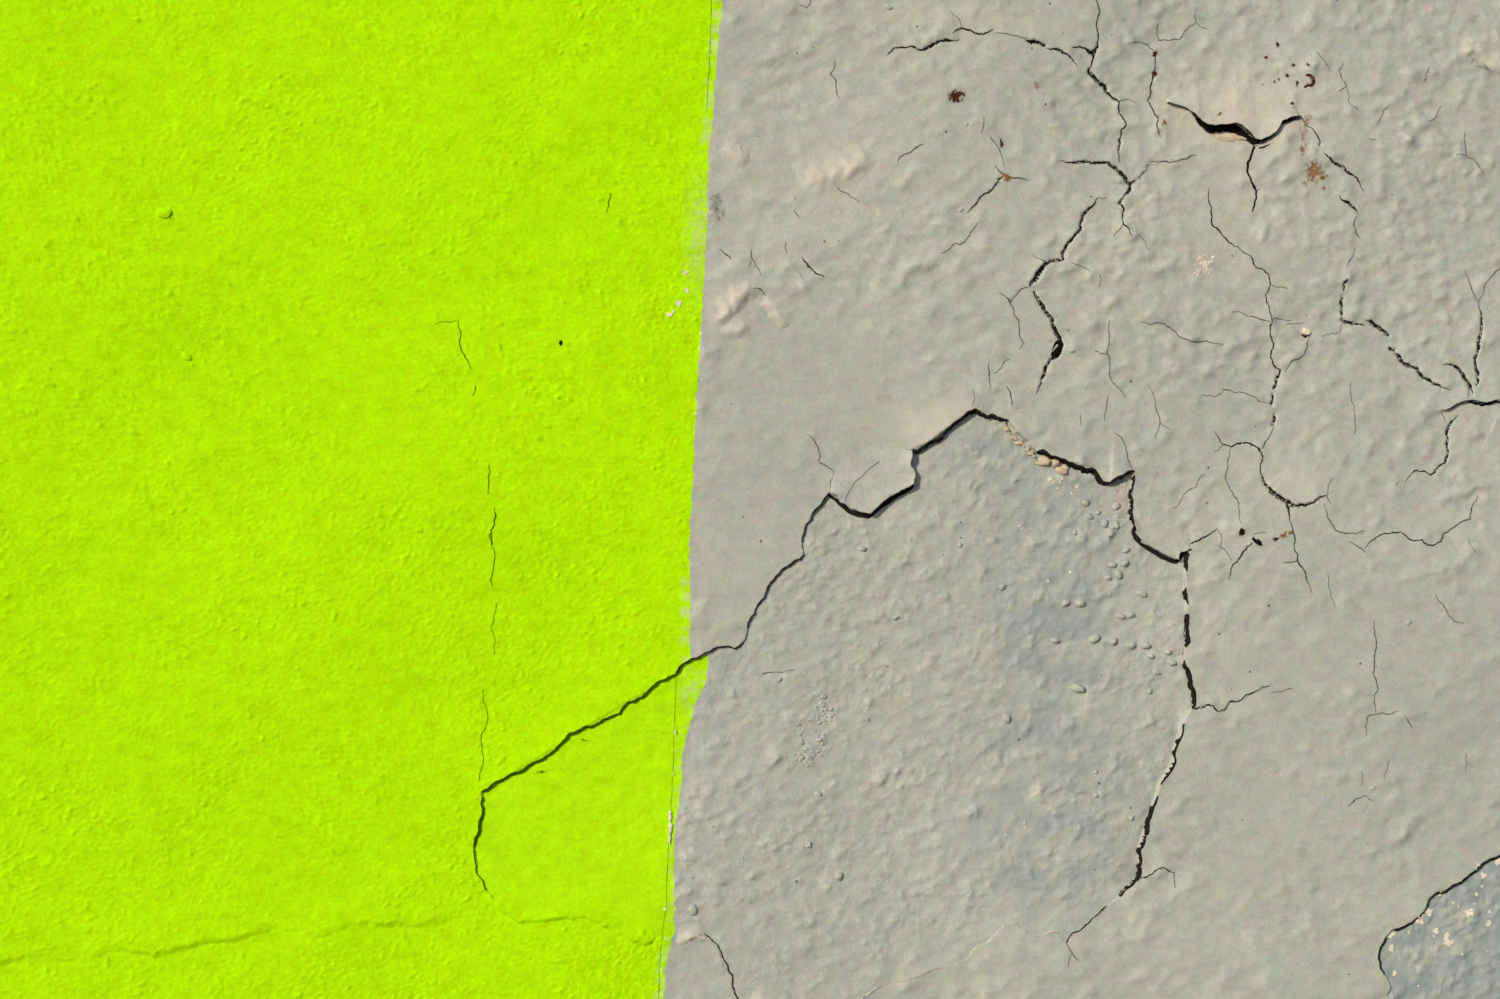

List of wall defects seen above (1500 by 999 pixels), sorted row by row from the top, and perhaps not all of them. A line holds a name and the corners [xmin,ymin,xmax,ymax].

crack [705,0,713,110]
peeling [1166,76,1300,212]
crack [887,0,1500,607]
crack [807,434,835,488]
spalling [473,409,1197,999]
crack [1194,685,1293,712]
crack [1348,621,1412,806]
crack [1139,867,1175,886]
spalling [1378,855,1500,999]